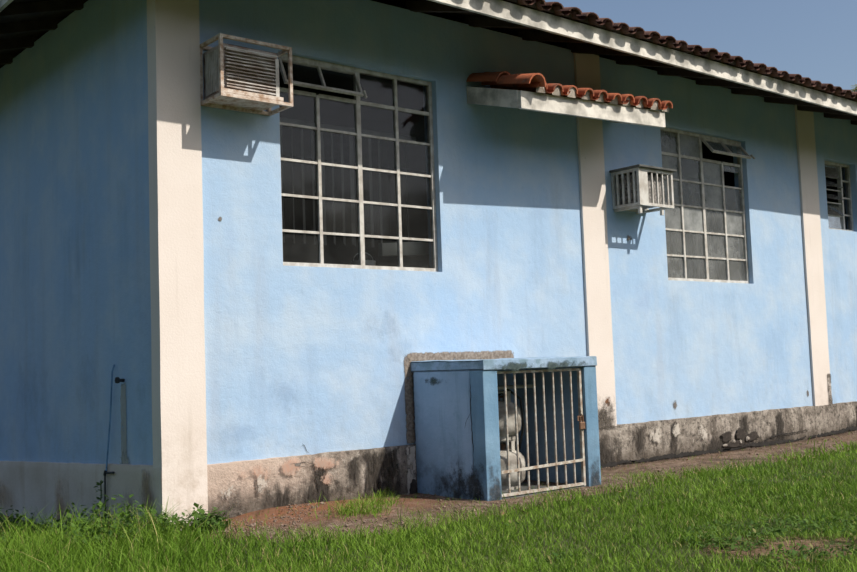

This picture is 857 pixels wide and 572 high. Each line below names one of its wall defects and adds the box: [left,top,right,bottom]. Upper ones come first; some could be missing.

water stain [591,404,622,486]
water stain [635,427,646,454]
water stain [671,422,680,454]
water stain [741,415,749,441]
water stain [760,411,793,447]
water stain [264,449,401,507]